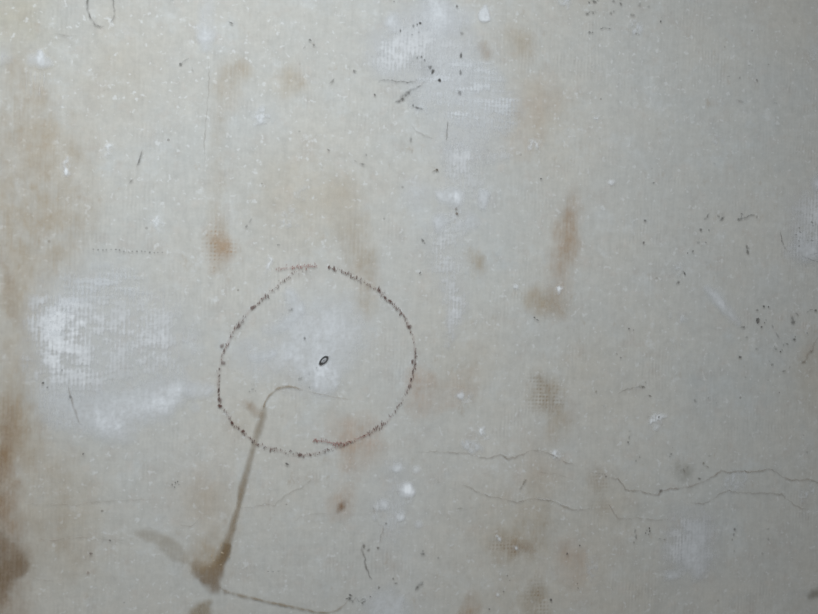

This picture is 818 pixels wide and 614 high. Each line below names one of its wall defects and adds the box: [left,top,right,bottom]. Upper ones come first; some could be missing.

damp [201,478,245,585]